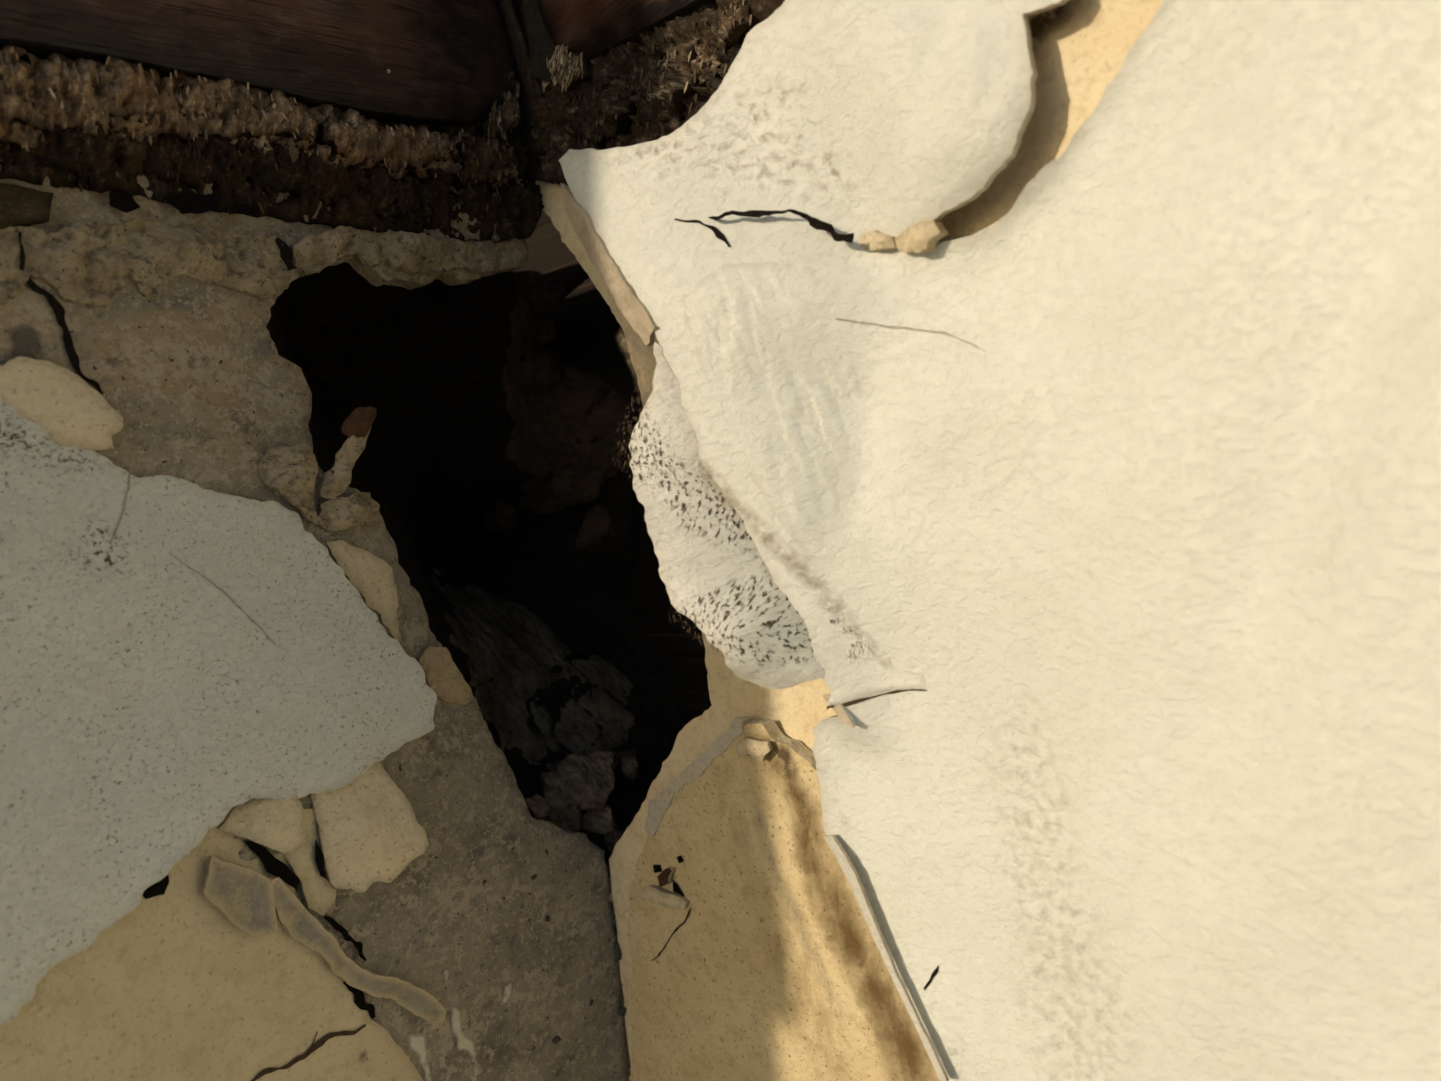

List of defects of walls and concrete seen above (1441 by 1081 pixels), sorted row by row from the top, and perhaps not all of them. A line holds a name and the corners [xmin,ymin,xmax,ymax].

water stain [1028,2,1068,47]
crack [674,209,854,247]
mould [618,397,752,552]
peeling [266,0,1239,1081]
mould [673,570,813,663]
peeling [0,356,446,1081]
crack [251,1024,366,1081]